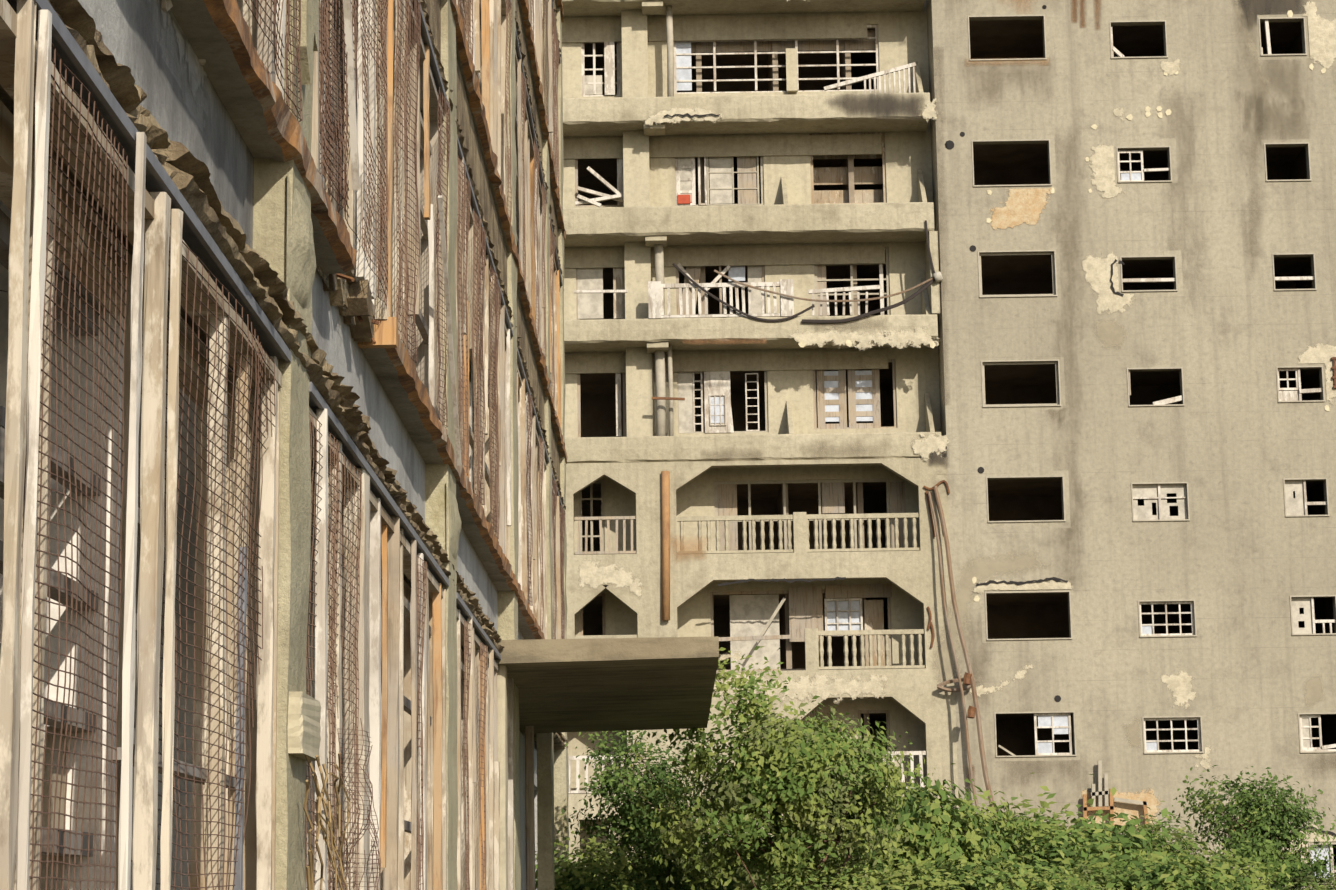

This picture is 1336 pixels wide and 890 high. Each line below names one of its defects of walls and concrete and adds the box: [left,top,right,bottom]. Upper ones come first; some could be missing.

leakage [1237,0,1304,26]
spalling [1287,1,1336,74]
spalling [645,107,723,125]
spalling [1113,106,1171,121]
spalling [1085,124,1126,198]
spalling [986,188,1055,230]
spalling [1082,252,1135,315]
spalling [789,326,939,349]
spalling [1298,343,1336,411]
spalling [578,560,643,599]
spalling [1160,670,1197,709]